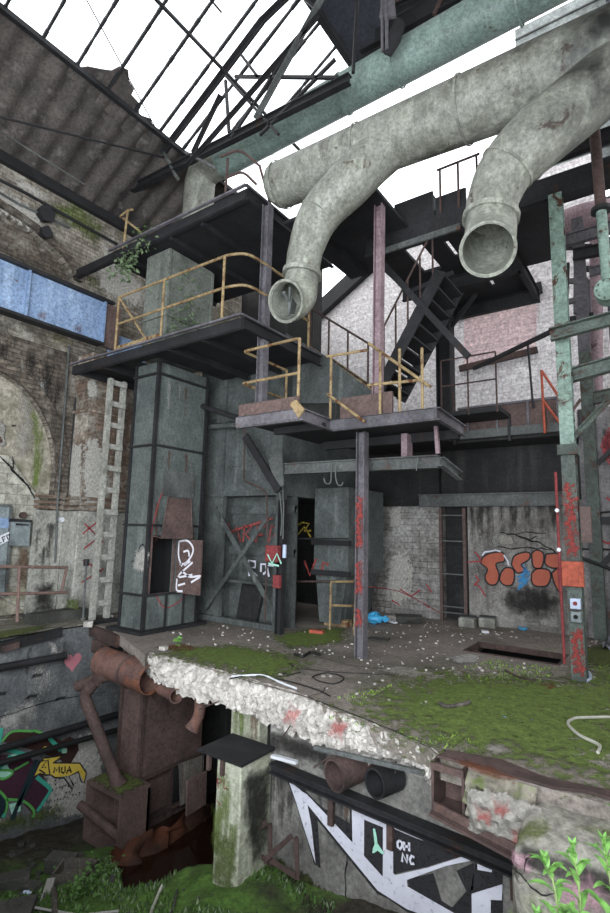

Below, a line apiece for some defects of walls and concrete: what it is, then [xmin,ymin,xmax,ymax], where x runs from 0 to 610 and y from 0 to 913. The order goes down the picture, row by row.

crack [0,456,35,498]
spalling [145,645,439,796]
damp [214,797,235,858]
spalling [467,786,542,843]